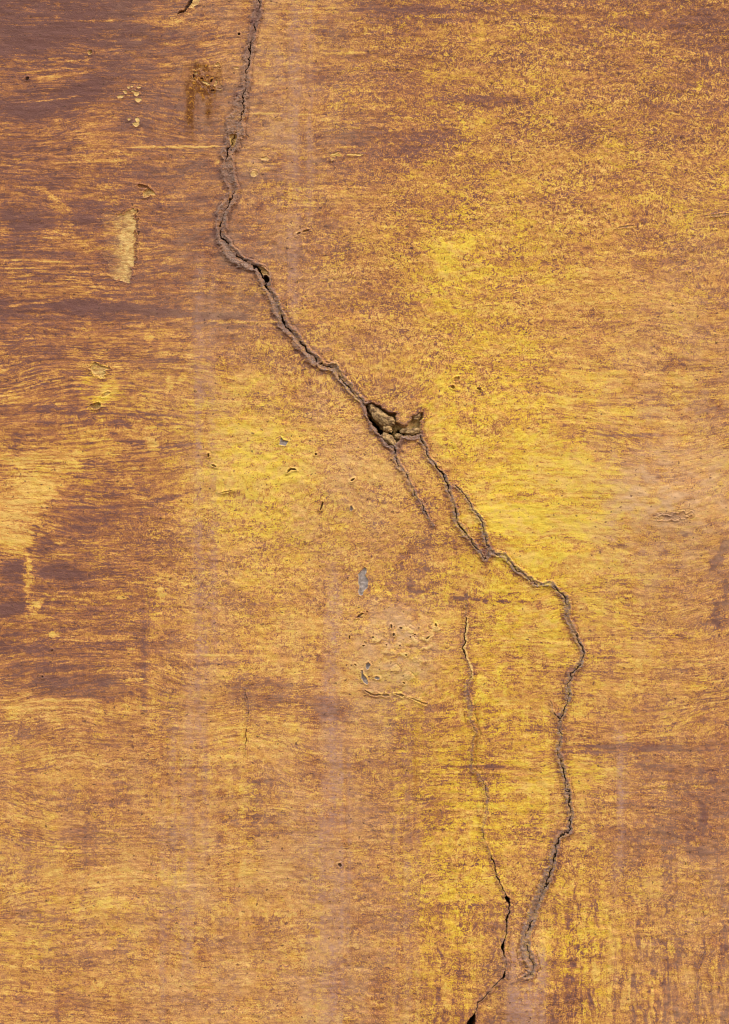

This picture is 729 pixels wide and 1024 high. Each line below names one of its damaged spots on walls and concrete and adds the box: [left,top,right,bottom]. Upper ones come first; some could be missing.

flaking render [97,182,158,285]
crack [212,0,590,1024]
peeling [353,565,371,621]
peeling [346,621,442,708]